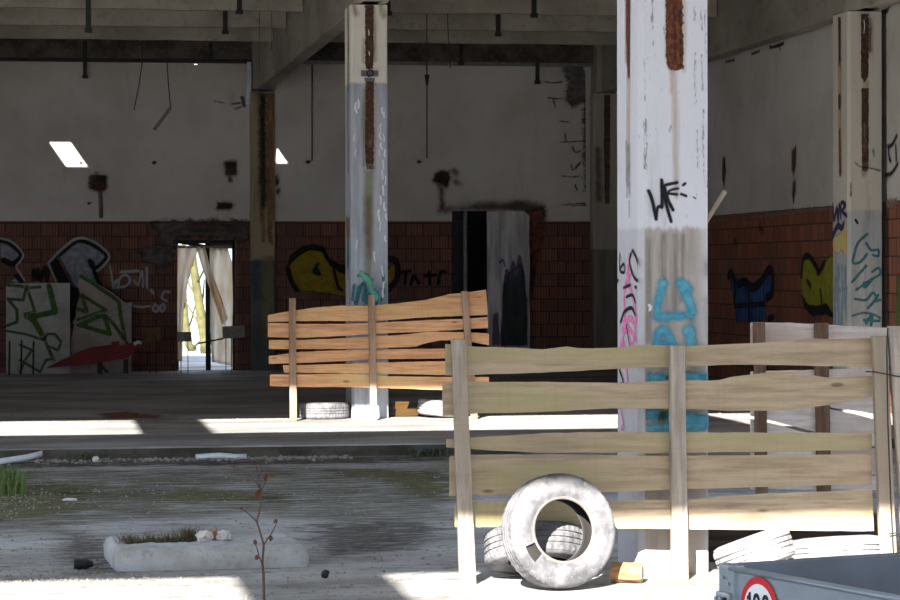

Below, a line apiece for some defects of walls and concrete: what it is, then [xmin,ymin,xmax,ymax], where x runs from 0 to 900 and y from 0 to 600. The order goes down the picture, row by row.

corrosion [364,5,382,69]
corrosion [665,0,684,71]
peeling [137,201,250,268]
corrosion [258,93,274,243]
corrosion [365,81,374,170]
water stain [432,169,458,211]
peeling [446,200,546,291]
corrosion [861,14,872,171]